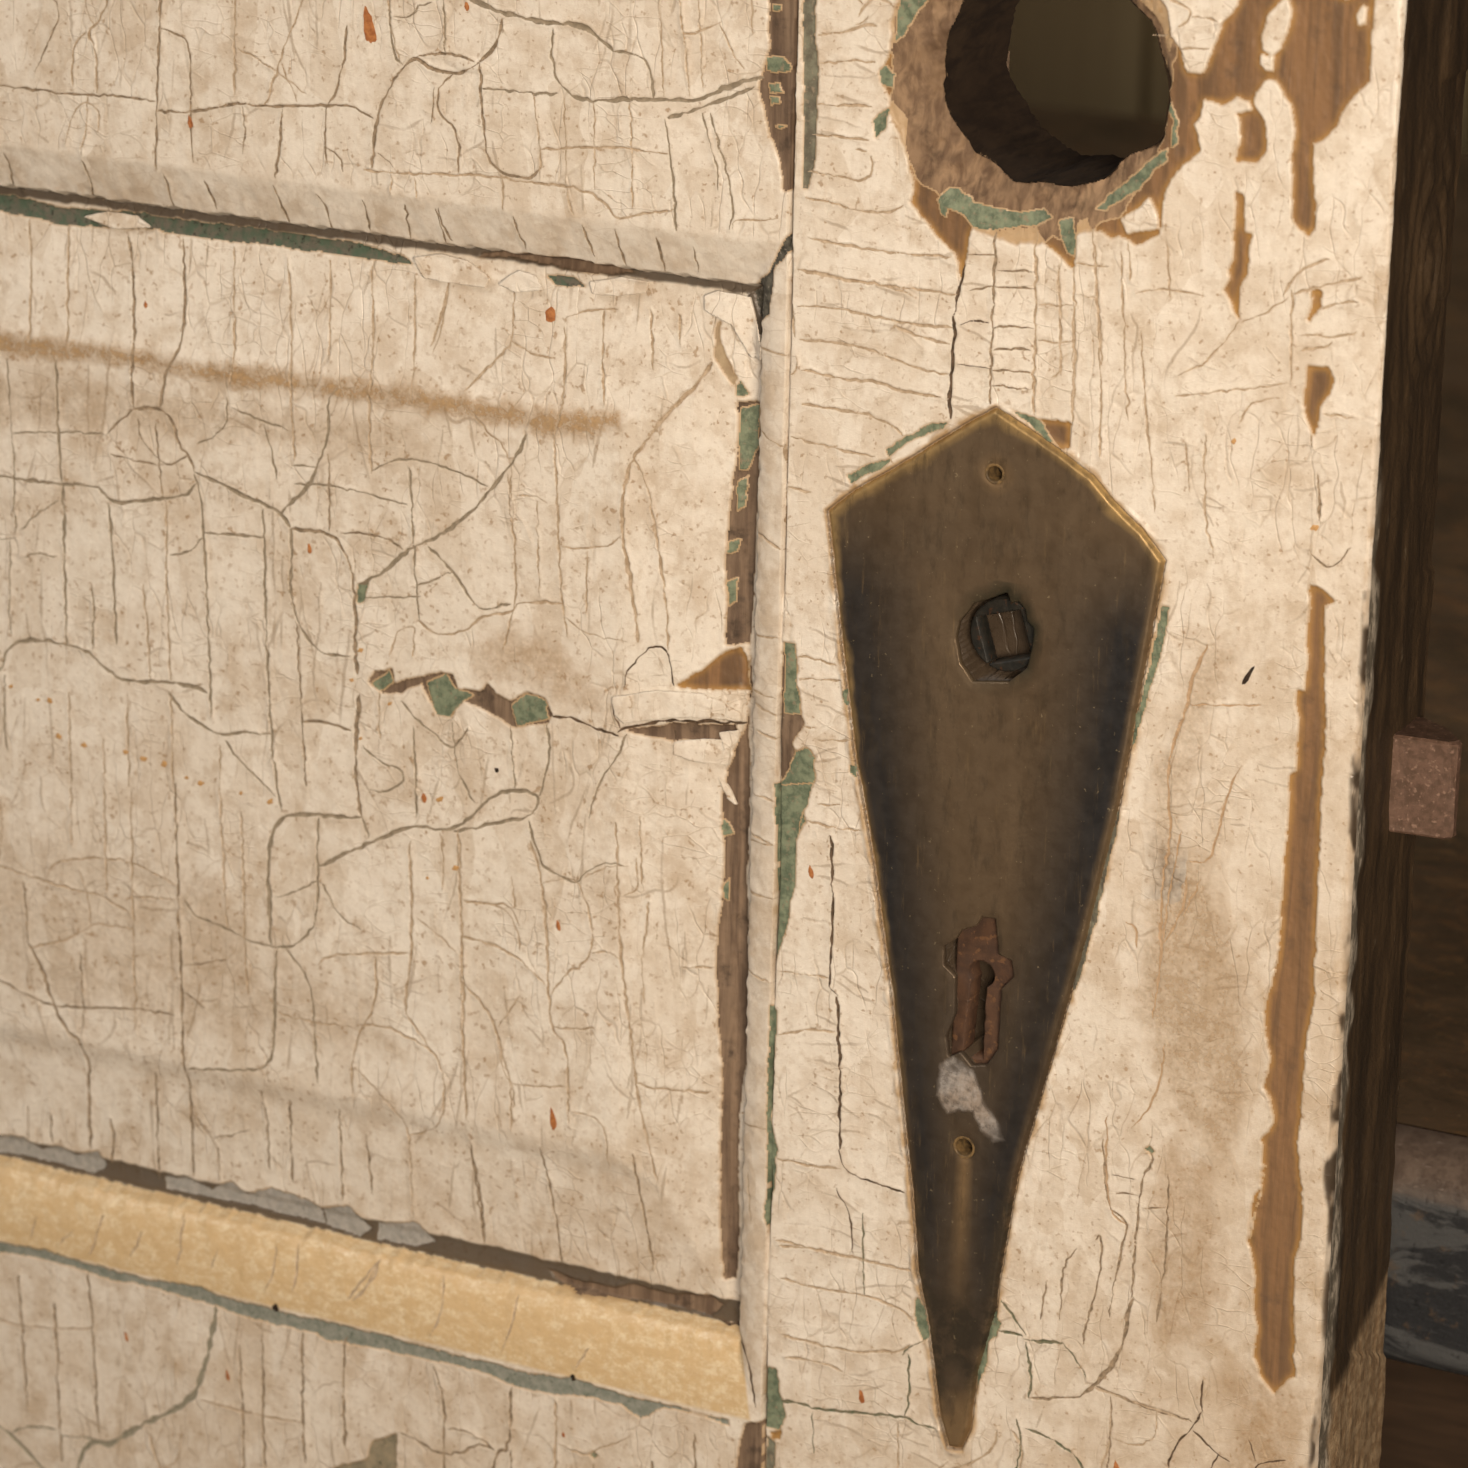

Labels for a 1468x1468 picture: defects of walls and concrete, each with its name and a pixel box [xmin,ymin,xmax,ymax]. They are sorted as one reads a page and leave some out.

peeling [0,194,649,296]
peeling [873,0,1374,277]
crack [1154,0,1217,50]
crack [0,0,851,1269]
peeling [369,669,552,727]
peeling [611,234,793,1279]
peeling [774,642,816,954]
crack [719,645,1286,1468]
peeling [1248,586,1334,1393]
crack [0,1215,306,1468]
crack [341,1336,349,1447]
crack [553,1400,654,1468]